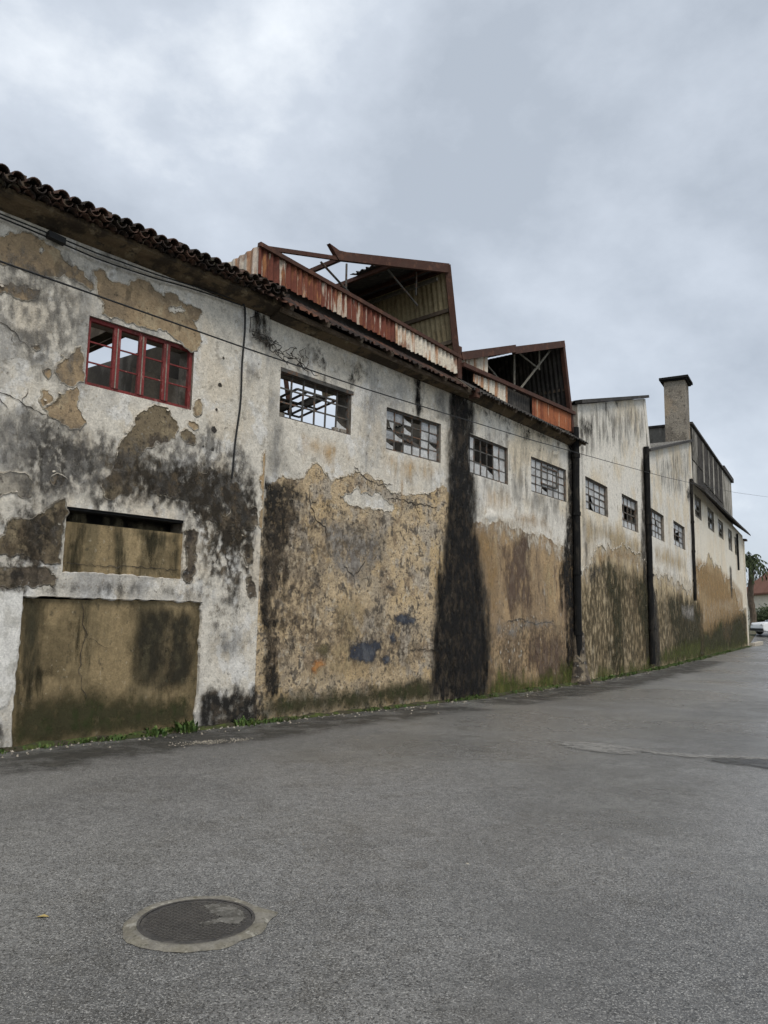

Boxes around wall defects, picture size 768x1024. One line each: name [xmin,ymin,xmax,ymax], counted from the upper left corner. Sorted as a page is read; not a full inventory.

flaking render [38,345,87,431]
flaking render [0,231,203,353]
water stain [0,418,302,726]
flaking render [0,398,748,747]
water stain [431,384,744,701]